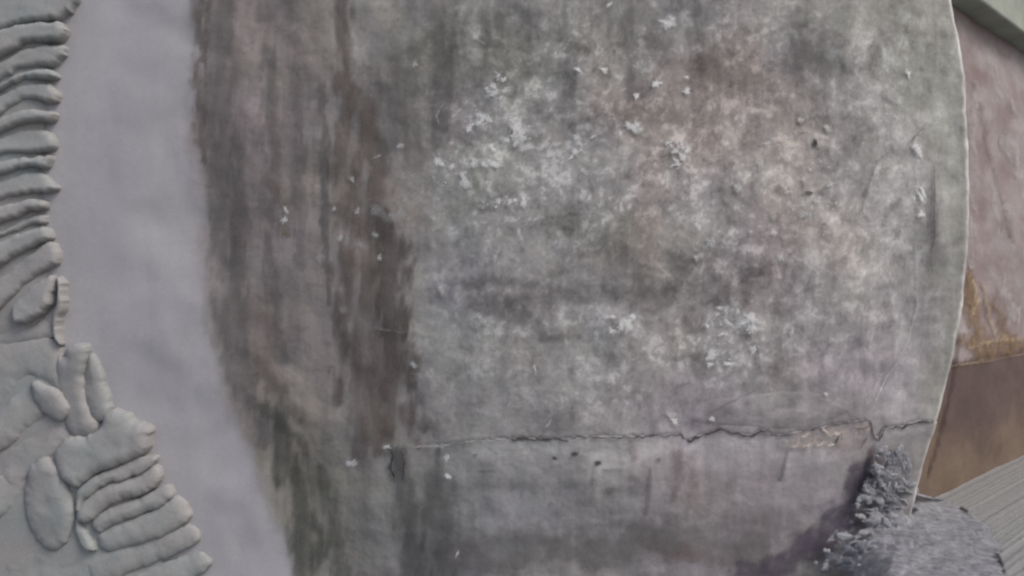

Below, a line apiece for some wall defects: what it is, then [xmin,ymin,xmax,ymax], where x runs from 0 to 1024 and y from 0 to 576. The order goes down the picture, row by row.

leakage [320,126,330,270]
leakage [257,404,324,576]
crack [412,420,932,448]